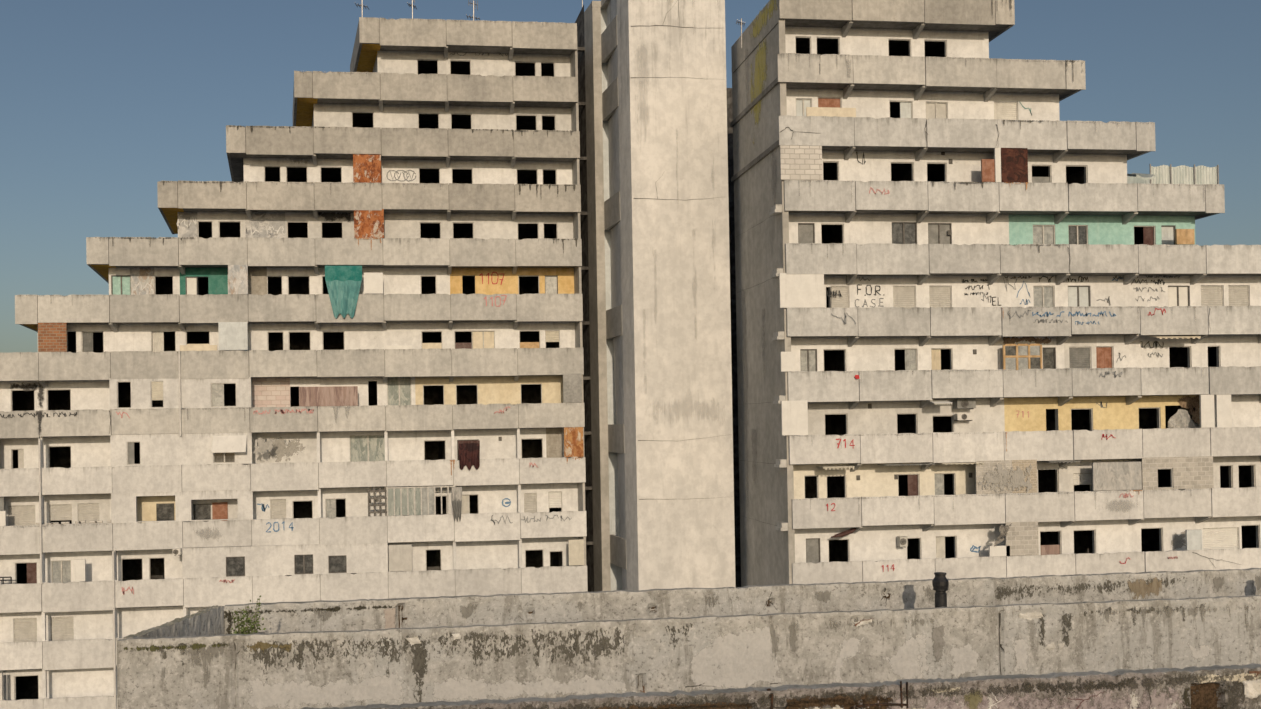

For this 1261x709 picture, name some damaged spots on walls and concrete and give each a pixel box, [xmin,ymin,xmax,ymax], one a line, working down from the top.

rust [354,209,384,250]
spalling [1179,395,1200,424]
rust [564,427,584,462]
damp [161,643,217,685]
damp [243,640,350,680]
damp [440,627,624,667]